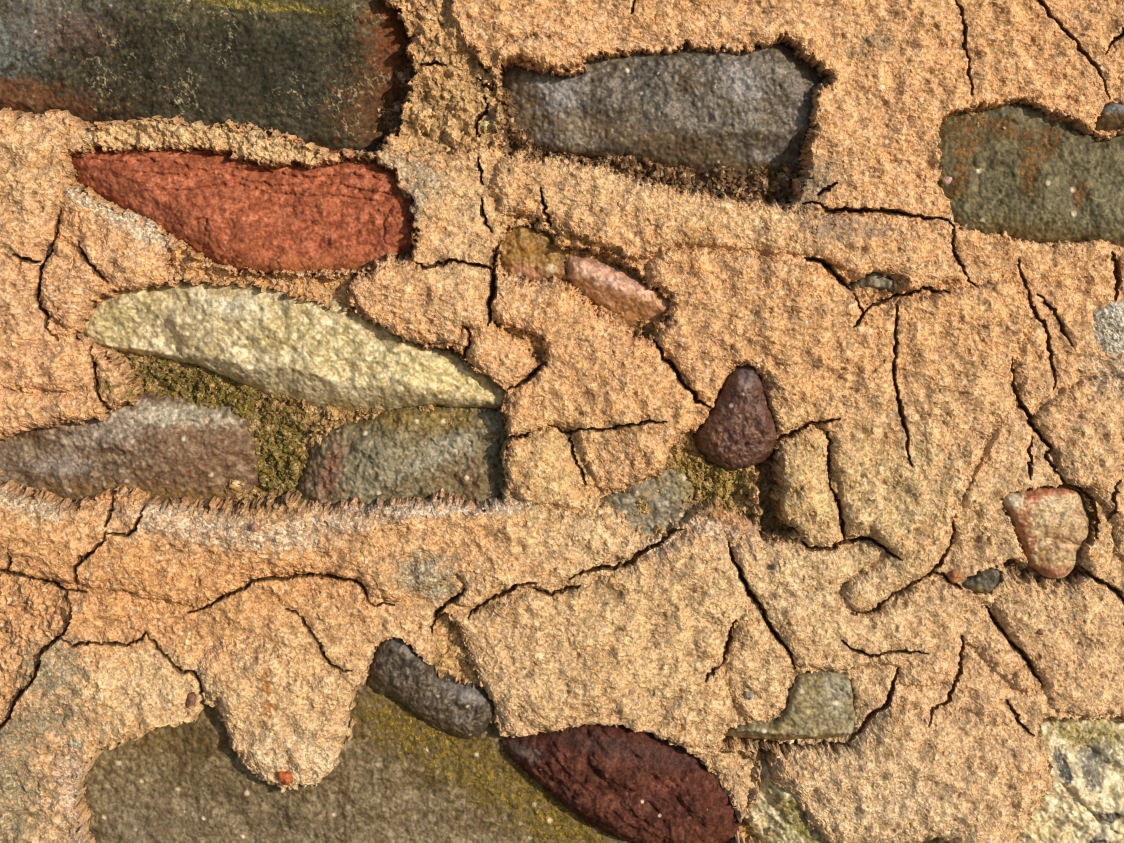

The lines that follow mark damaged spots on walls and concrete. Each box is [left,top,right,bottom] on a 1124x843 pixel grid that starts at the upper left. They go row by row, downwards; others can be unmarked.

crack [1036,0,1124,98]
spalling [78,118,319,162]
crack [0,496,204,729]
peeling [93,350,134,409]
peeling [39,210,547,386]
crack [431,529,684,632]
crack [705,542,795,682]
crack [777,418,960,616]
crack [802,183,976,467]
crack [1017,259,1073,389]
crack [1010,358,1121,538]
peeling [707,751,758,815]